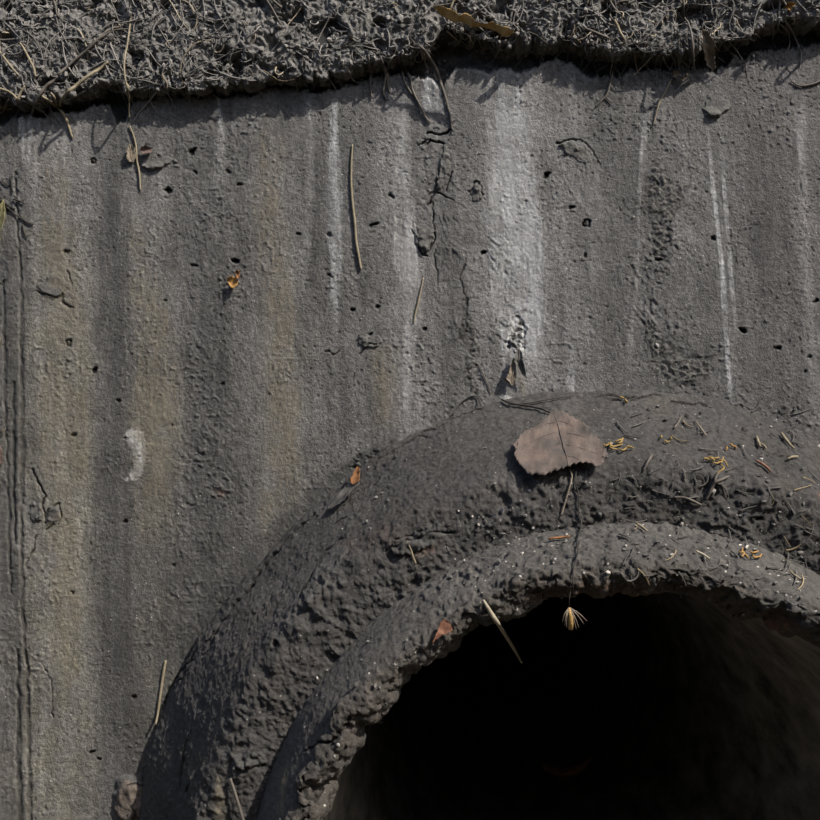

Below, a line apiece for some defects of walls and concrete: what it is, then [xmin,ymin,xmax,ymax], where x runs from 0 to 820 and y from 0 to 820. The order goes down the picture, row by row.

damp [392,119,417,290]
crack [418,129,450,146]
crack [413,169,483,282]
damp [490,156,541,356]
damp [402,301,417,393]
crack [183,516,312,669]